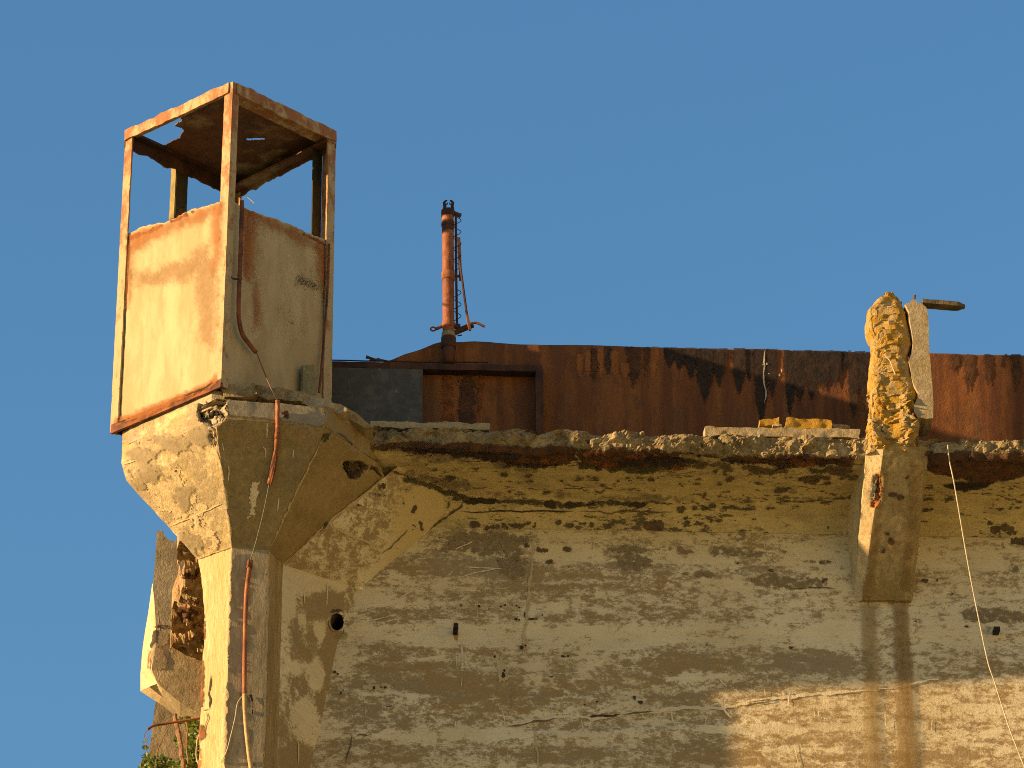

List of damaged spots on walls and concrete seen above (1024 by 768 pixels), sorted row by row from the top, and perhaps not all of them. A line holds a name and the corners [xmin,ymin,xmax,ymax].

rust [128,206,218,256]
rust [245,208,326,282]
rust [577,346,658,390]
rust [115,376,217,424]
rust [441,375,485,424]
spalling [343,461,382,480]
water stain [403,464,473,501]
spalling [369,426,869,499]
spalling [915,431,1024,464]
peeling [124,398,232,669]
spalling [221,682,229,766]
crack [497,679,938,727]